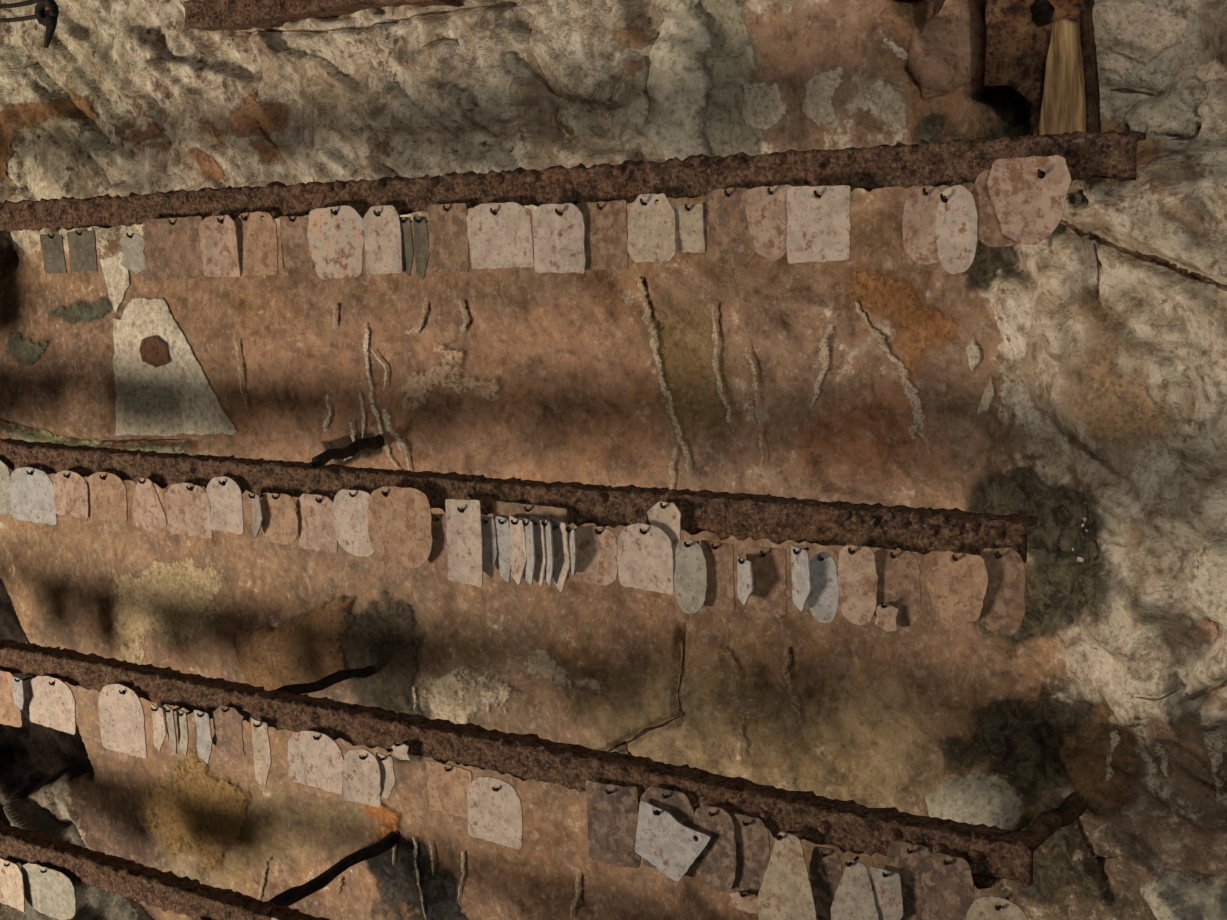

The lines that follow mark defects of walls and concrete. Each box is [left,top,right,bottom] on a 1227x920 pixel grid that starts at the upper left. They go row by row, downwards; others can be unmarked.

crack [1061,220,1227,293]
corrosion [648,302,727,443]
corrosion [844,268,958,377]
leakage [965,468,1109,676]
crack [606,633,685,757]
crack [1135,679,1227,701]
leakage [940,677,1097,831]
corrosion [363,805,398,838]
leakage [1014,818,1126,912]